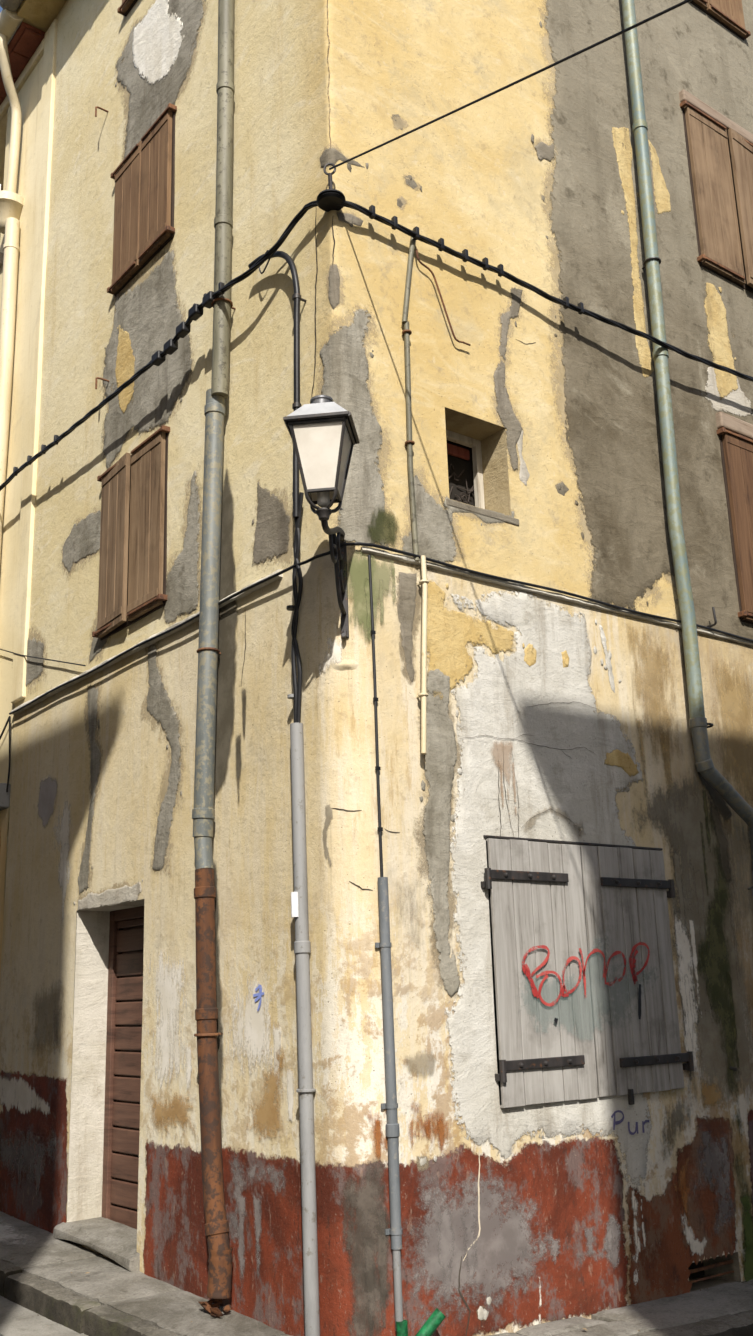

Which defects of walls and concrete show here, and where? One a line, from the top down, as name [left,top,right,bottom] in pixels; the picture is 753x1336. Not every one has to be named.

peeling [531,0,753,649]
peeling [105,325,135,413]
damp [365,566,396,638]
peeling [403,578,537,718]
peeling [604,749,646,776]
damp [628,631,753,1156]
damp [682,1214,707,1256]